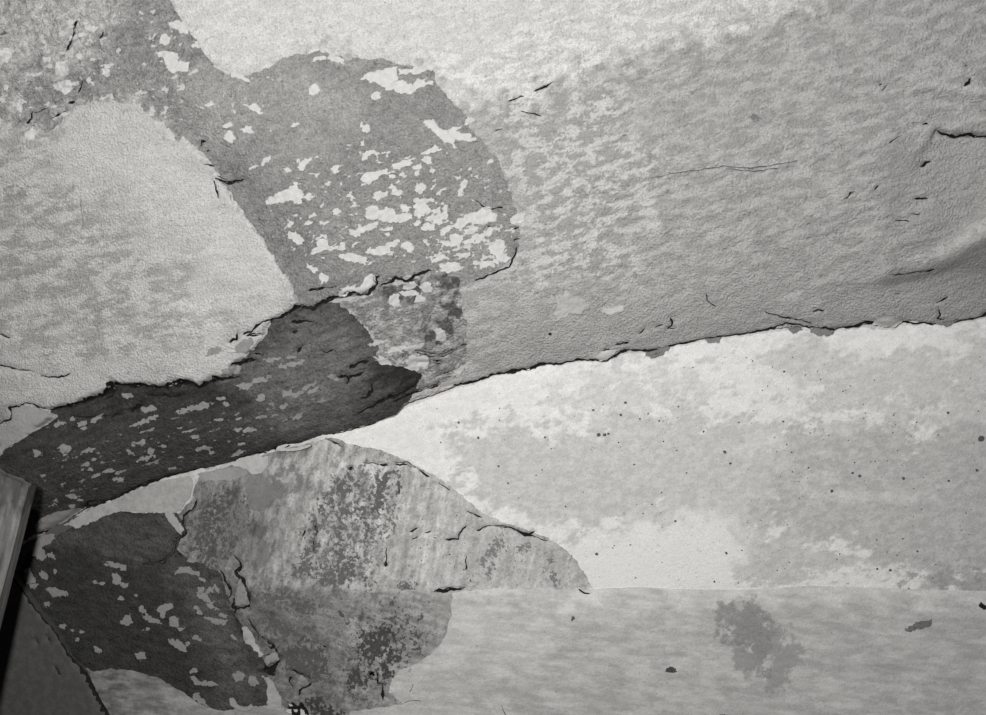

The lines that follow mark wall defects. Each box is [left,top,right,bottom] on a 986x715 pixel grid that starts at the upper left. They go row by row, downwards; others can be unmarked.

crack [923,122,986,139]
crack [902,297,986,325]
flaking render [0,0,525,711]
crack [0,269,874,494]
crack [38,466,215,534]
leakage [715,598,805,693]
flaking render [286,702,309,715]